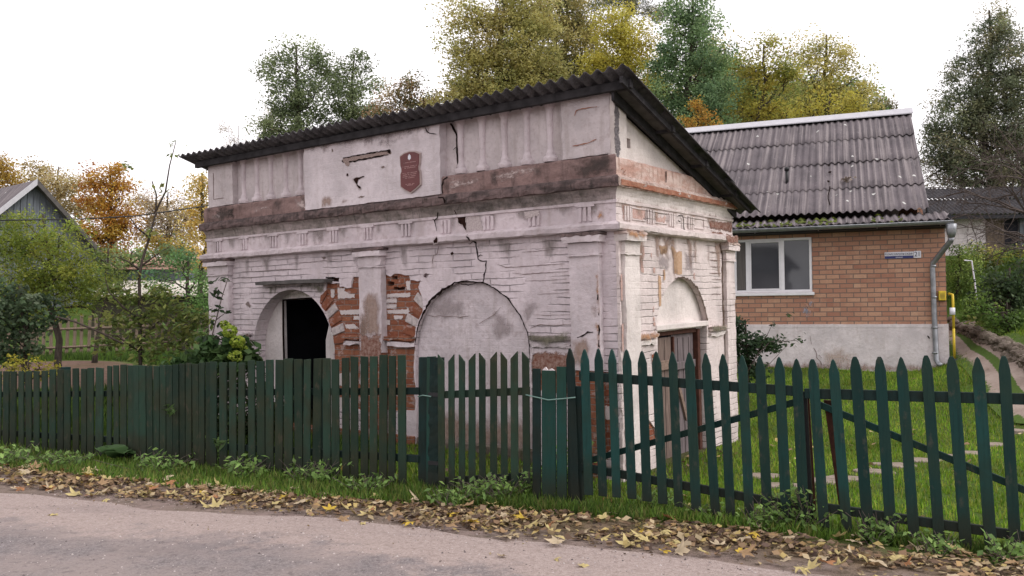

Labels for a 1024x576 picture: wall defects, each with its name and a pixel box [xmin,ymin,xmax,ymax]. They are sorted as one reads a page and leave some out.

spalling [331,149,391,198]
crack [425,123,458,264]
spalling [320,270,427,411]
crack [415,234,600,362]
flaking render [640,245,695,326]